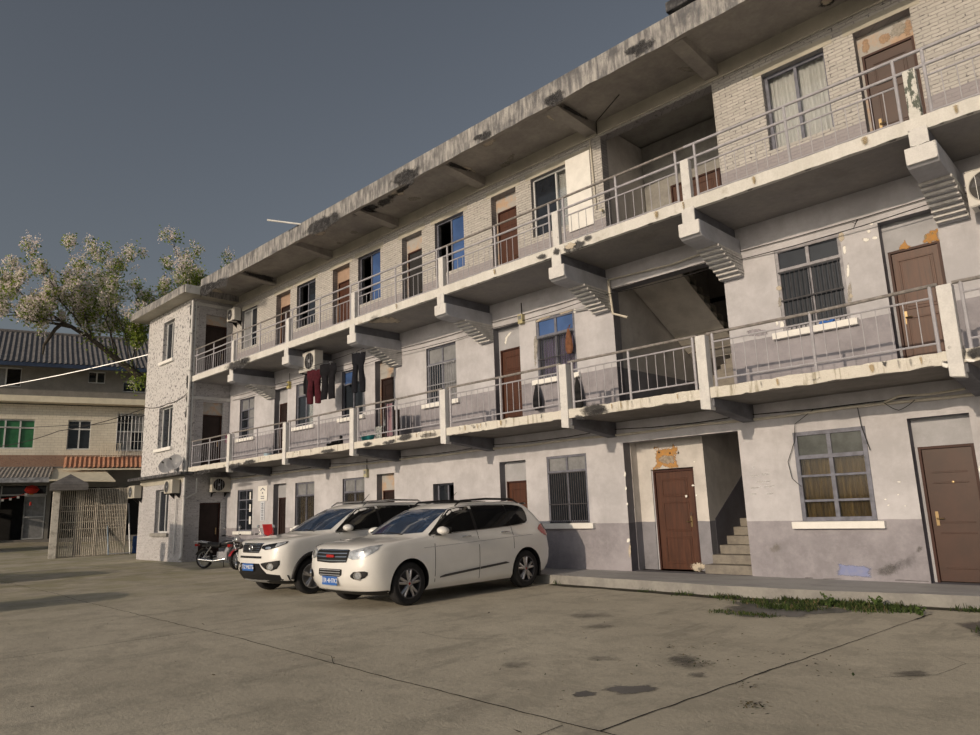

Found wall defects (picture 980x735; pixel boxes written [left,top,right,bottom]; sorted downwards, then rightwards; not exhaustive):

peeling [862,20,912,53]